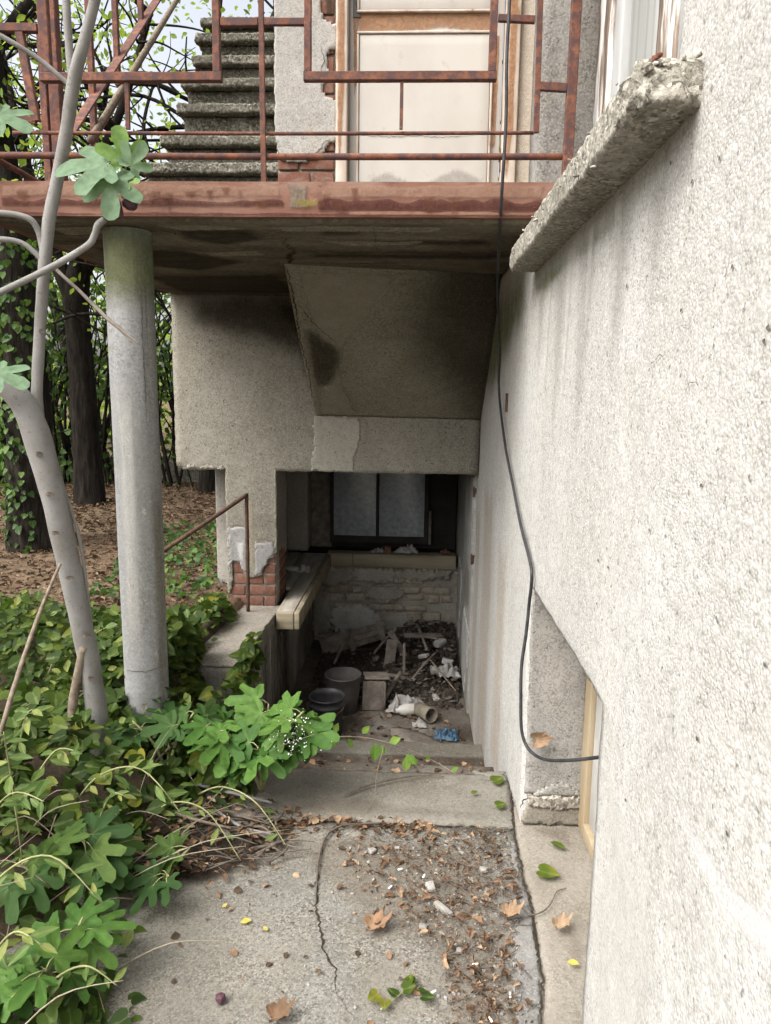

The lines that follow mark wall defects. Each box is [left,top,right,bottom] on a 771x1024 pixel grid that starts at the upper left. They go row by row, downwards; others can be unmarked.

spalling [641,51,703,79]
rust [338,0,518,173]
rust [2,192,46,215]
rust [57,199,102,215]
rust [121,193,543,217]
water stain [183,231,258,244]
water stain [153,251,337,384]
water stain [314,241,502,398]
flaking render [227,524,275,576]
spalling [521,793,580,826]
crack [289,819,361,1017]